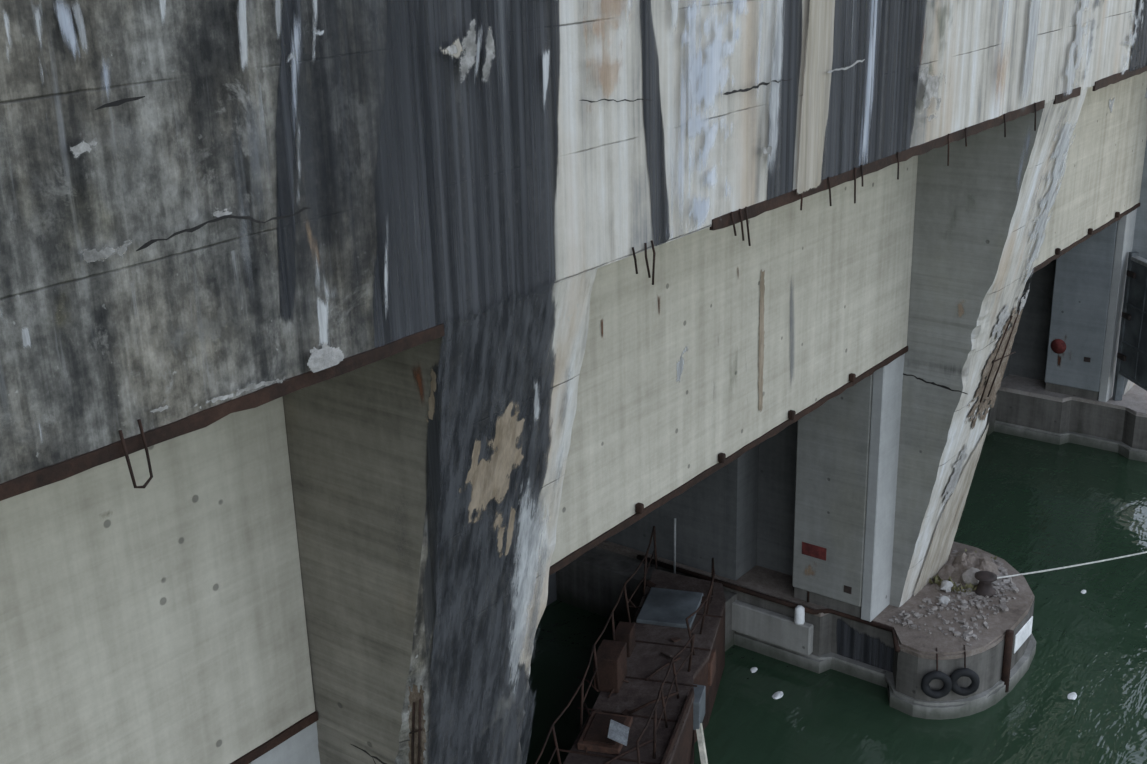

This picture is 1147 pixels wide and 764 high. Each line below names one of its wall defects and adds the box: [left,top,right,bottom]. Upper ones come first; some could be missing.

damp [57,4,87,52]
damp [239,0,247,65]
peeling [443,20,495,83]
crack [723,79,792,95]
crack [827,59,865,73]
damp [275,0,398,322]
crack [136,207,311,251]
damp [22,328,30,346]
damp [307,291,344,373]
crack [903,373,967,394]
spalling [966,290,1029,429]
peeling [459,401,525,556]